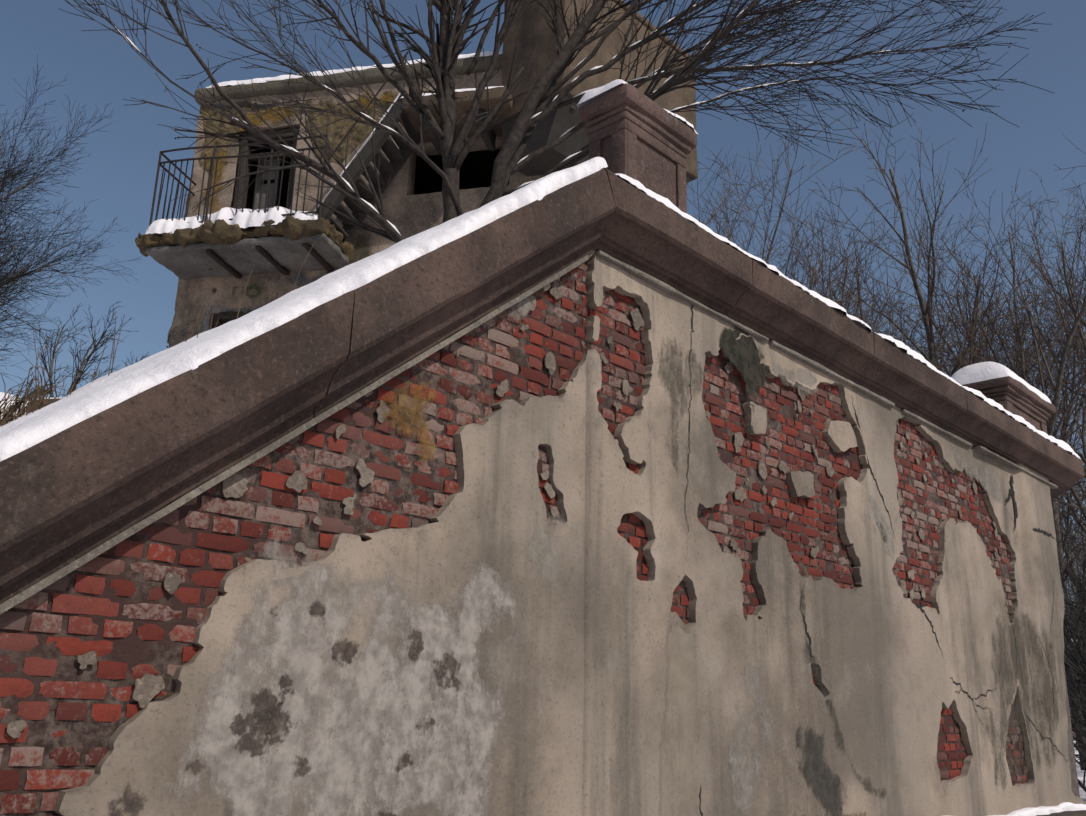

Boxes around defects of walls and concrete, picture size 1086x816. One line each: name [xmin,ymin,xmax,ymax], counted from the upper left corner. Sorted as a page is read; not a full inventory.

flaking render [0,260,649,816]
flaking render [671,579,689,625]
flaking render [697,348,863,615]
crack [800,581,815,660]
flaking render [892,419,1013,619]
crack [912,475,1069,762]
flaking render [937,705,968,781]
flaking render [1006,702,1028,785]